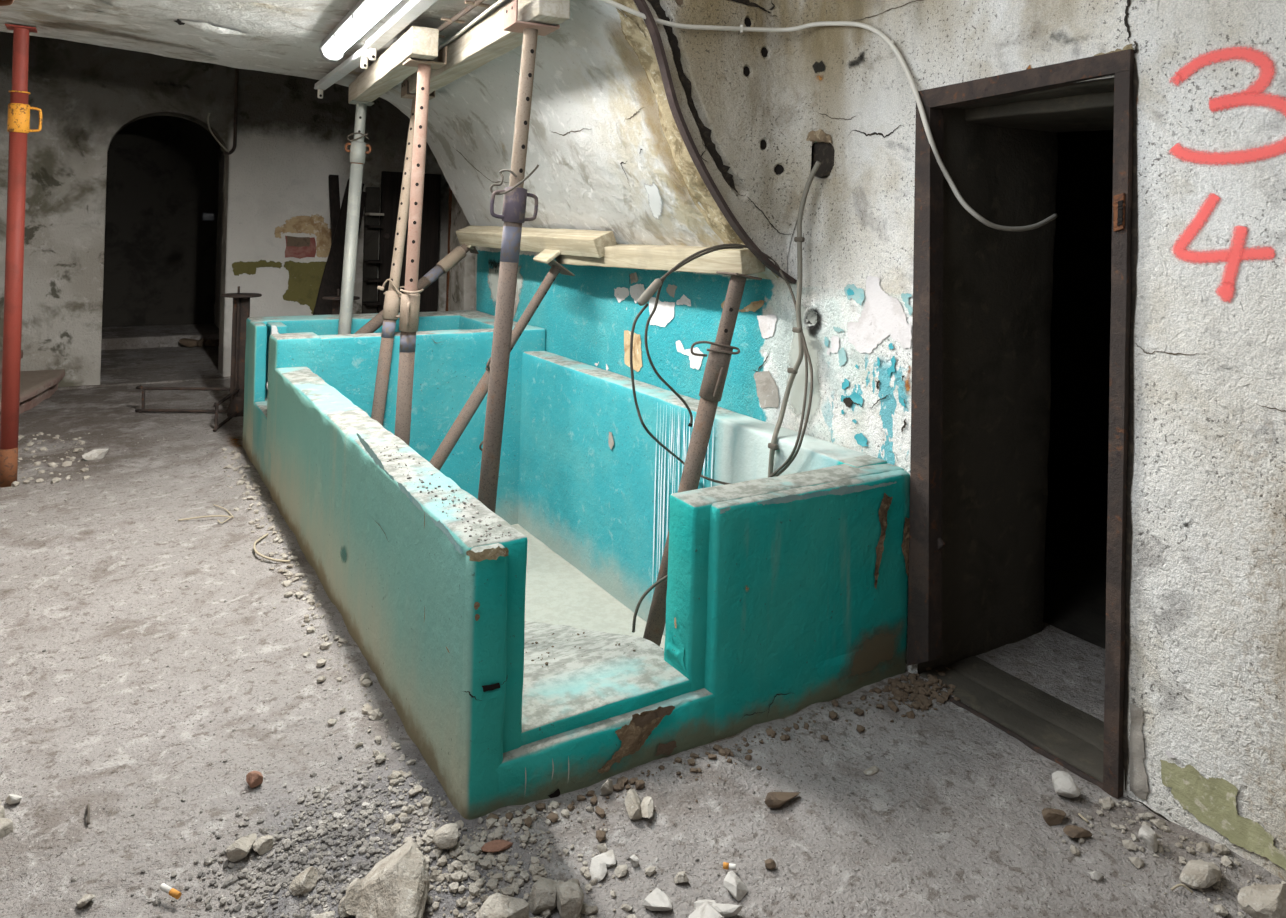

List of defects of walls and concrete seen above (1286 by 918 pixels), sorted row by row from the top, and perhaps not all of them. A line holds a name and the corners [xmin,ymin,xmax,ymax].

crack [647,0,793,235]
peeling [232,214,332,314]
flaking render [824,276,913,447]
crack [1123,0,1211,822]
spalling [598,705,677,774]
peeling [1129,703,1286,870]